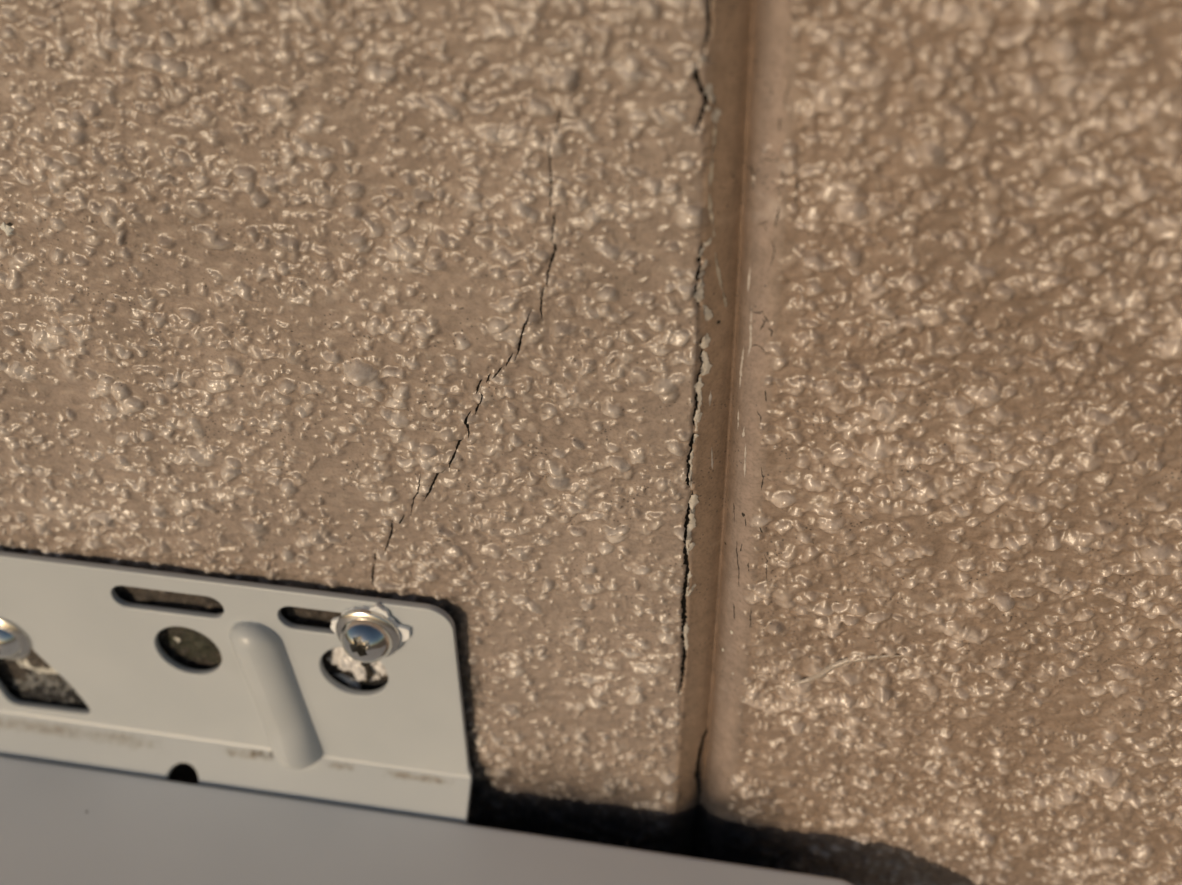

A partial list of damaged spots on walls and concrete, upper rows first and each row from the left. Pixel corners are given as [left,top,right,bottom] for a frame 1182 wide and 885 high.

crack [693,0,721,131]
crack [371,109,561,590]
crack [753,310,773,355]
crack [679,237,713,692]
crack [733,504,768,626]